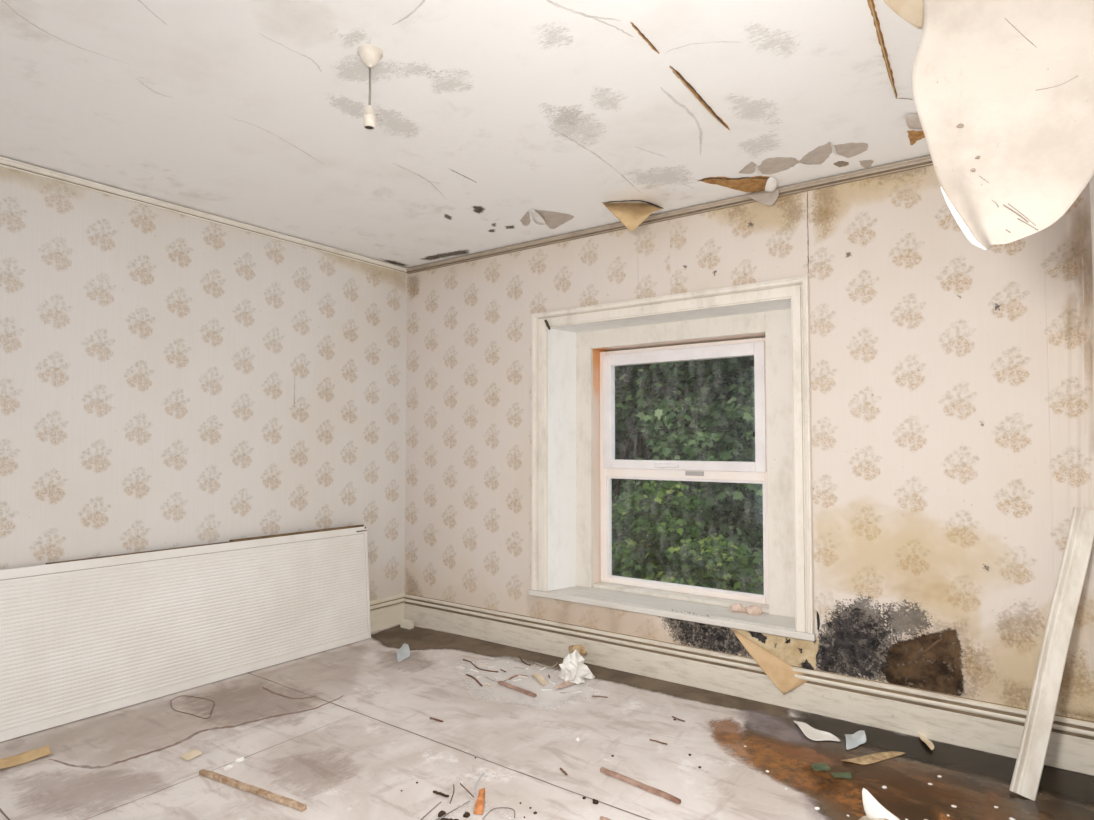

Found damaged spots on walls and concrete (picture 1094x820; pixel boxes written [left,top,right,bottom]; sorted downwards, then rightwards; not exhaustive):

peeling [699,142,874,206]
damp [371,625,564,671]
damp [657,595,964,696]
damp [584,663,1094,820]